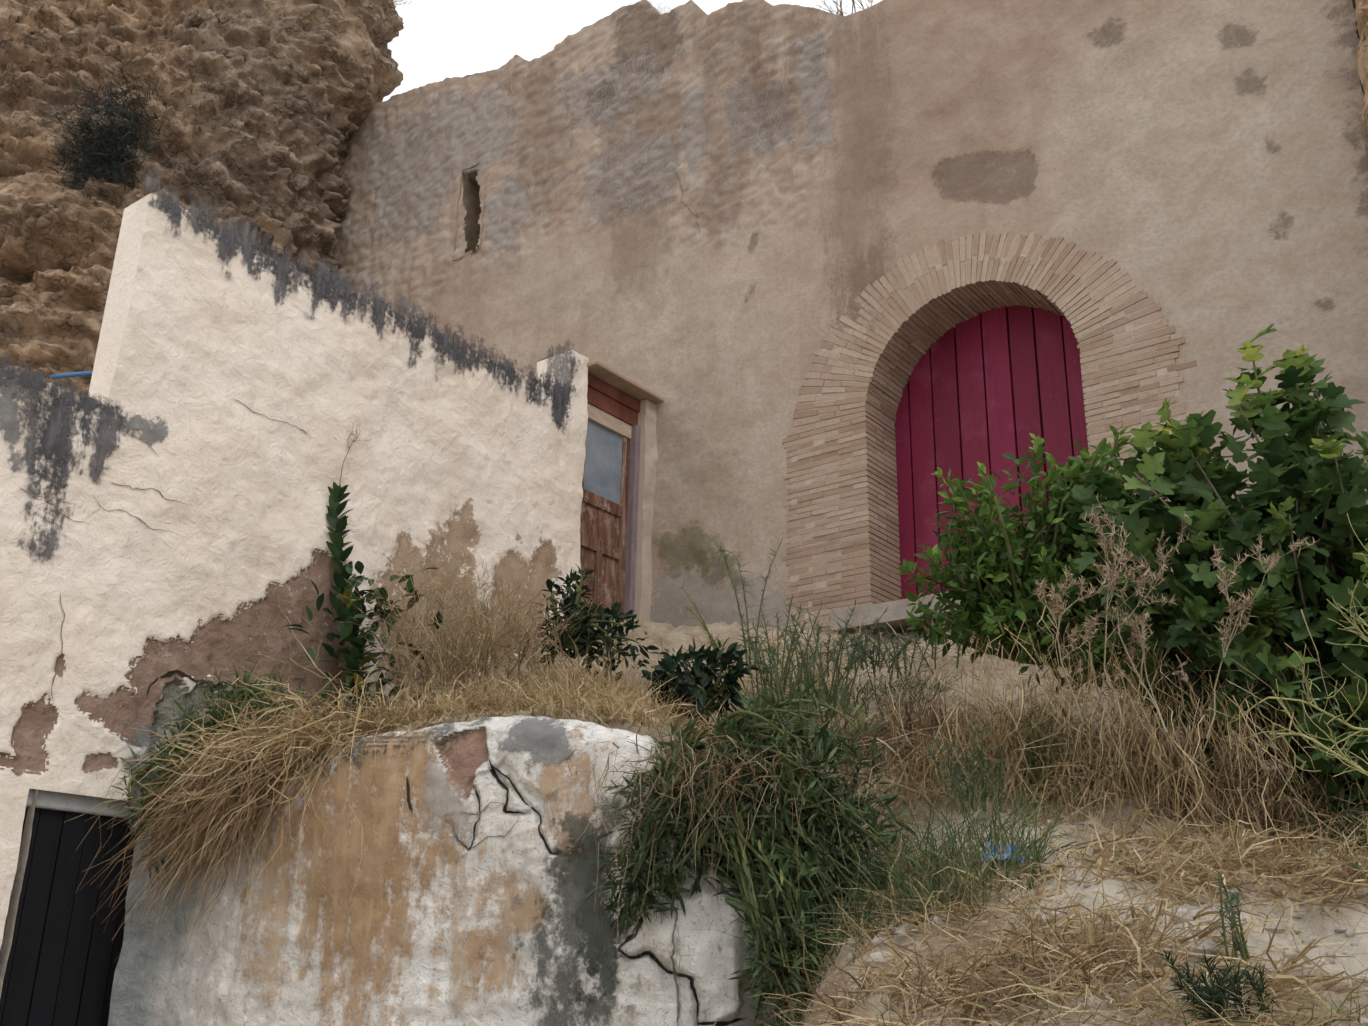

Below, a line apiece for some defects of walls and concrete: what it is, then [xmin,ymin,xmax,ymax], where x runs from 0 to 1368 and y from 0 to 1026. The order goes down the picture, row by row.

crack [1352,0,1360,39]
leakage [143,173,580,430]
leakage [0,354,168,562]
spalling [54,653,66,677]
spalling [75,498,562,811]
spalling [0,693,59,775]
crack [406,760,574,854]
crack [618,907,745,1026]